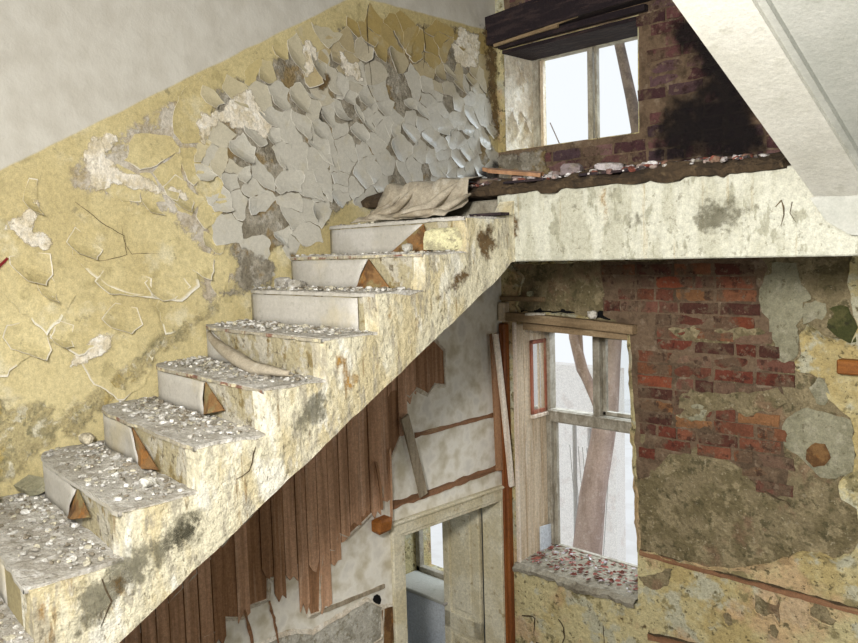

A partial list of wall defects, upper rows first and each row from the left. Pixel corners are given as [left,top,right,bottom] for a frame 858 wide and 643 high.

flaking render [748,106,781,155]
crack [77,203,149,262]
peeling [0,0,709,481]
spalling [510,256,858,590]
spalling [120,339,447,643]
leakage [75,511,202,636]
spalling [751,591,785,642]
spalling [807,603,842,630]